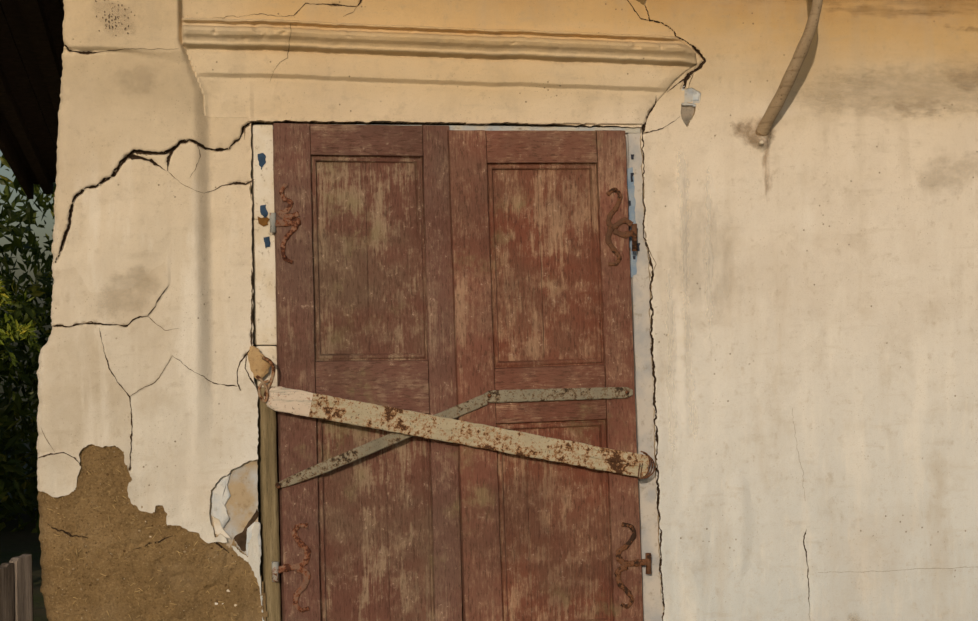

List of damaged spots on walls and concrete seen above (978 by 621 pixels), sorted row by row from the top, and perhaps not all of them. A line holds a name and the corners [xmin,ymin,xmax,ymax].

crack [217,0,362,81]
crack [55,122,254,263]
crack [53,270,257,471]
crack [39,428,81,465]
flaking render [37,444,268,621]
crack [803,529,828,617]